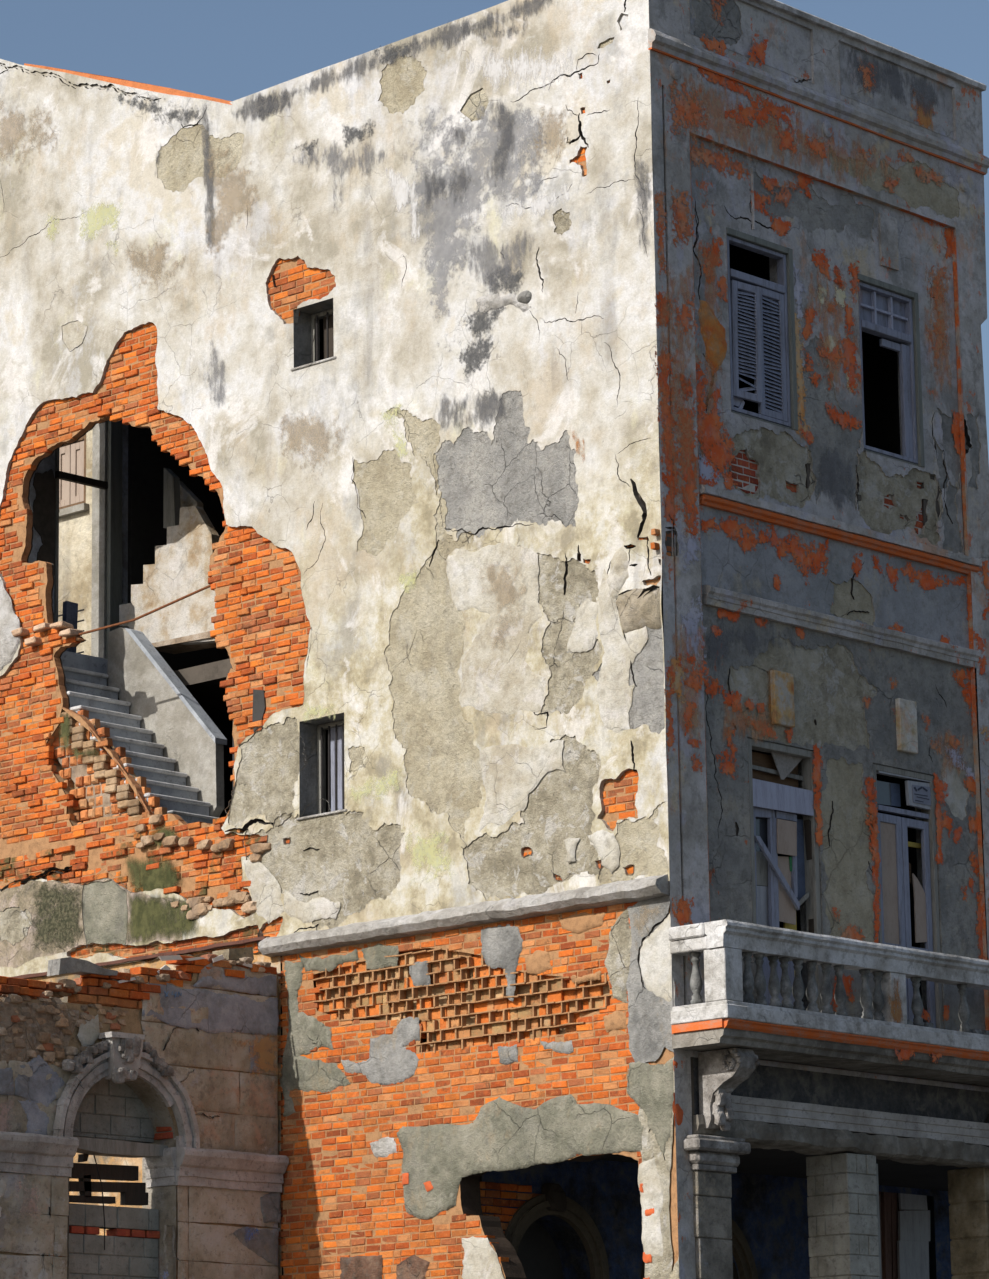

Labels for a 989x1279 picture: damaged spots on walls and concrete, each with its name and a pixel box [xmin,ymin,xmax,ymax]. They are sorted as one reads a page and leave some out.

crack [0,63,161,100]
spalling [266,256,336,324]
leakage [295,104,569,378]
crack [510,53,648,257]
peeling [654,185,729,302]
flaking render [667,68,960,369]
flaking render [0,320,404,968]
flaking render [352,390,668,900]
crack [563,438,676,687]
flaking render [628,595,898,943]
flaking render [627,248,989,737]
flaking render [921,713,989,959]